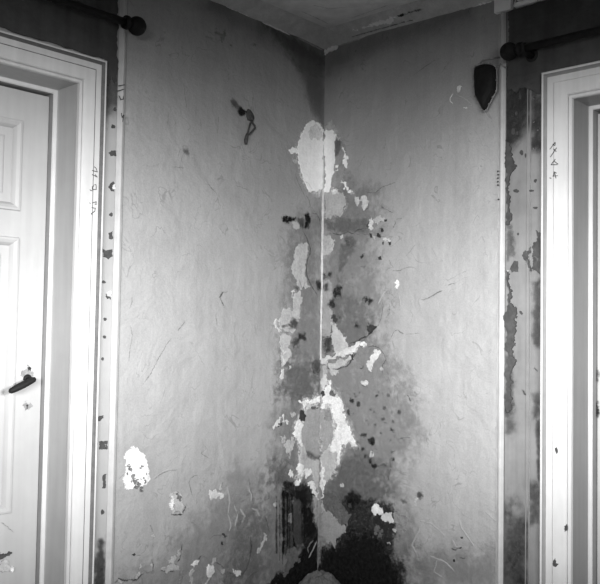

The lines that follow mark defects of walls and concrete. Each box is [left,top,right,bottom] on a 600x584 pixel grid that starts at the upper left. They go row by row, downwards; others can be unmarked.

damp [282,213,311,230]
flaking render [289,119,369,219]
peeling [497,140,526,225]
damp [531,93,541,149]
peeling [274,242,310,379]
damp [316,273,342,307]
peeling [503,230,541,413]
flaking render [272,279,384,557]
flaking render [122,446,151,492]
damp [270,481,405,584]
flaking render [371,503,409,545]
damp [504,484,538,584]